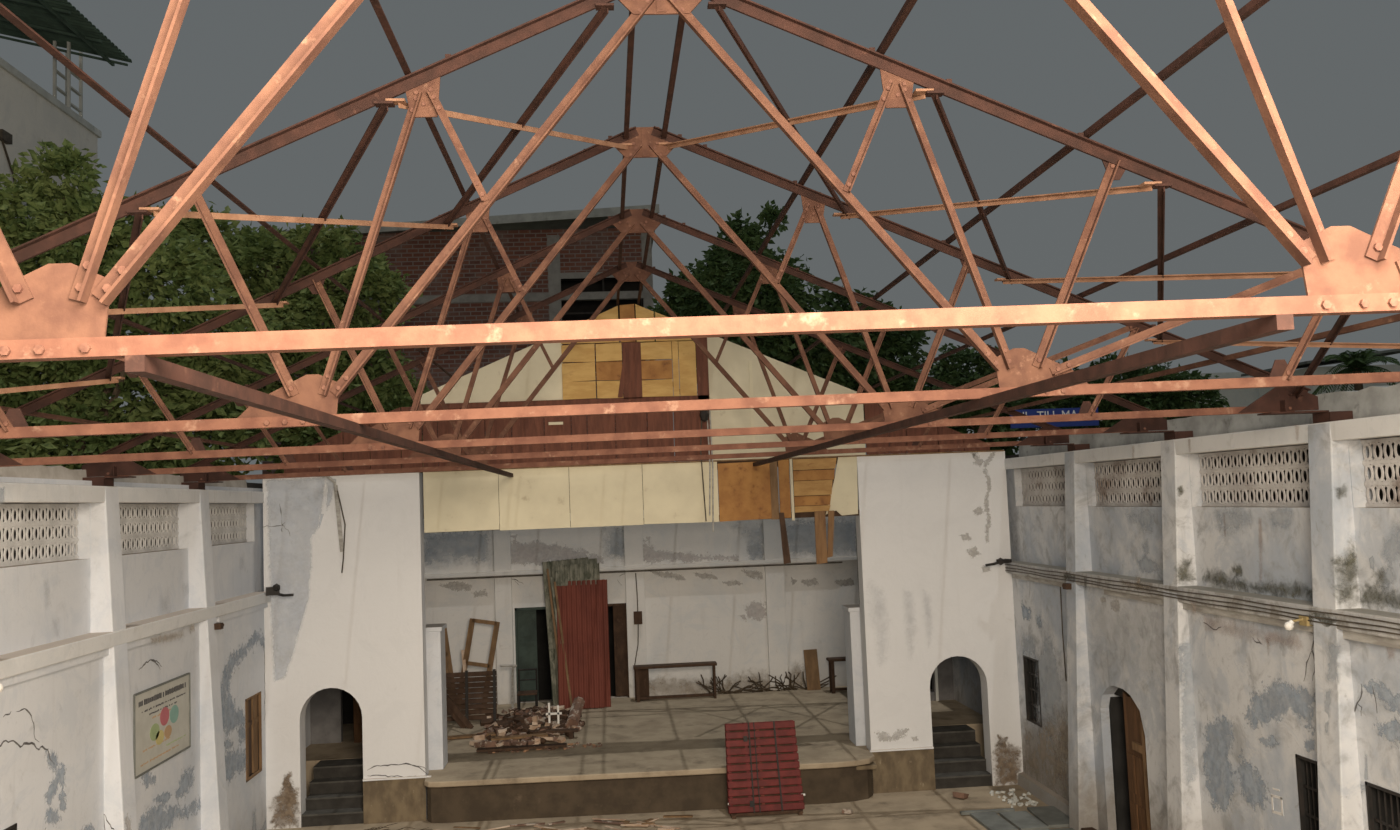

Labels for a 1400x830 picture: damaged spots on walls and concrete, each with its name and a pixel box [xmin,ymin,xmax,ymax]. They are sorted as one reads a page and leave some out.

crack [0,708,53,762]
peeling [45,751,66,823]
peeling [125,769,201,830]
peeling [220,630,265,782]
crack [367,763,428,777]
peeling [1203,681,1315,812]
peeling [1363,679,1400,742]